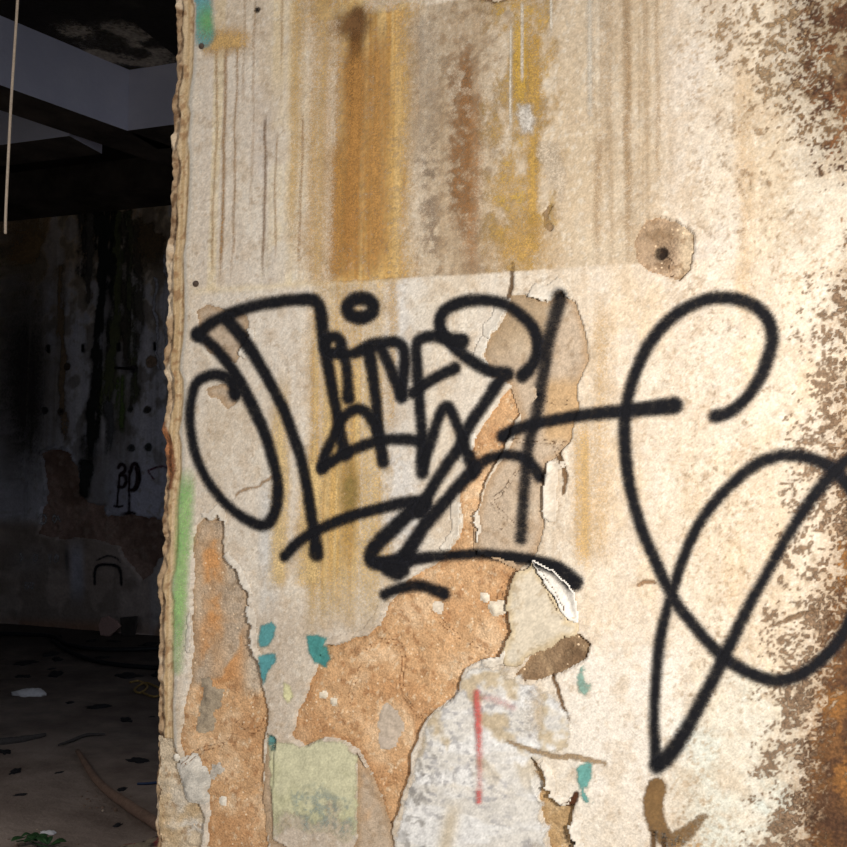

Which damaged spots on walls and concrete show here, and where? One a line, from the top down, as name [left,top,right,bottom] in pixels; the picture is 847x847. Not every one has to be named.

corrosion [290,0,418,282]
leakage [56,265,69,440]
leakage [75,209,168,498]
peeling [197,304,246,363]
peeling [236,315,256,343]
spalling [634,217,694,281]
corrosion [784,267,847,463]
peeling [38,444,165,580]
spalling [292,277,607,847]
corrosion [761,461,847,674]
spalling [158,505,287,847]
corrosion [741,641,847,847]